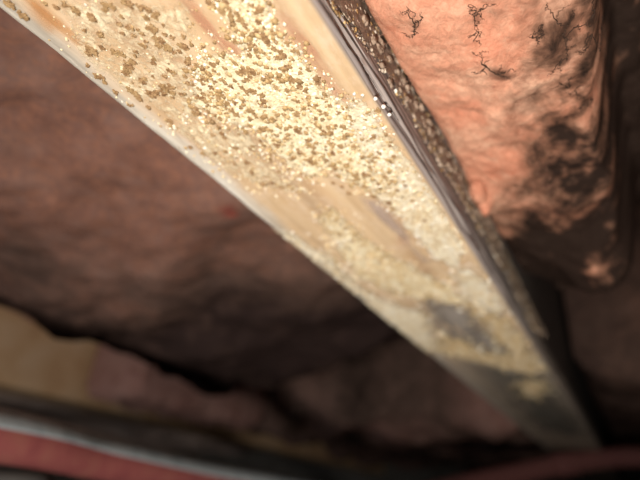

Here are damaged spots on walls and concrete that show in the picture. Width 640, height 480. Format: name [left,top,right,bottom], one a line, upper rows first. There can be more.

water stain [3,0,30,21]
water stain [545,0,608,76]
water stain [40,0,580,435]